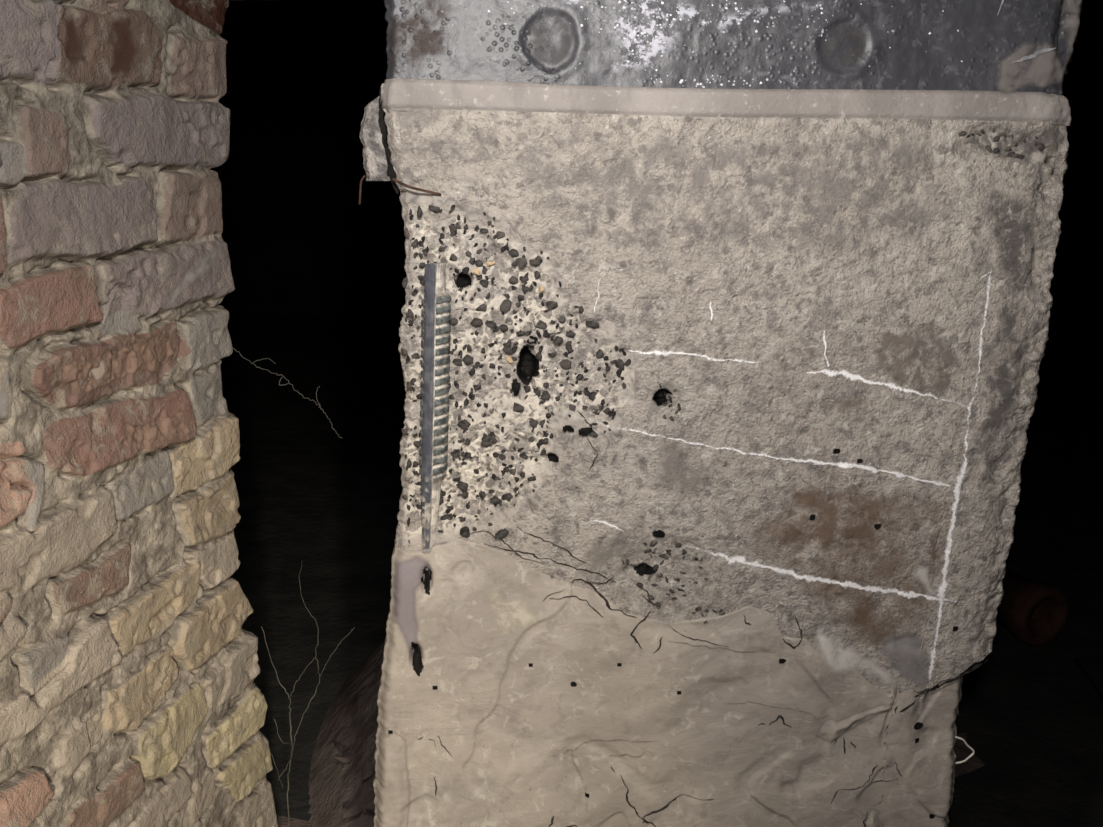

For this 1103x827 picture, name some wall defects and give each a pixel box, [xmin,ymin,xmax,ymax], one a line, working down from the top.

water stain [564,0,785,83]
water stain [679,75,794,88]
spalling [359,84,636,554]
crack [577,410,598,470]
spalling [421,567,432,595]
crack [459,527,756,653]
crack [783,614,802,649]
crack [894,659,988,714]
crack [727,701,856,753]
crack [560,740,714,827]
crack [831,762,902,805]